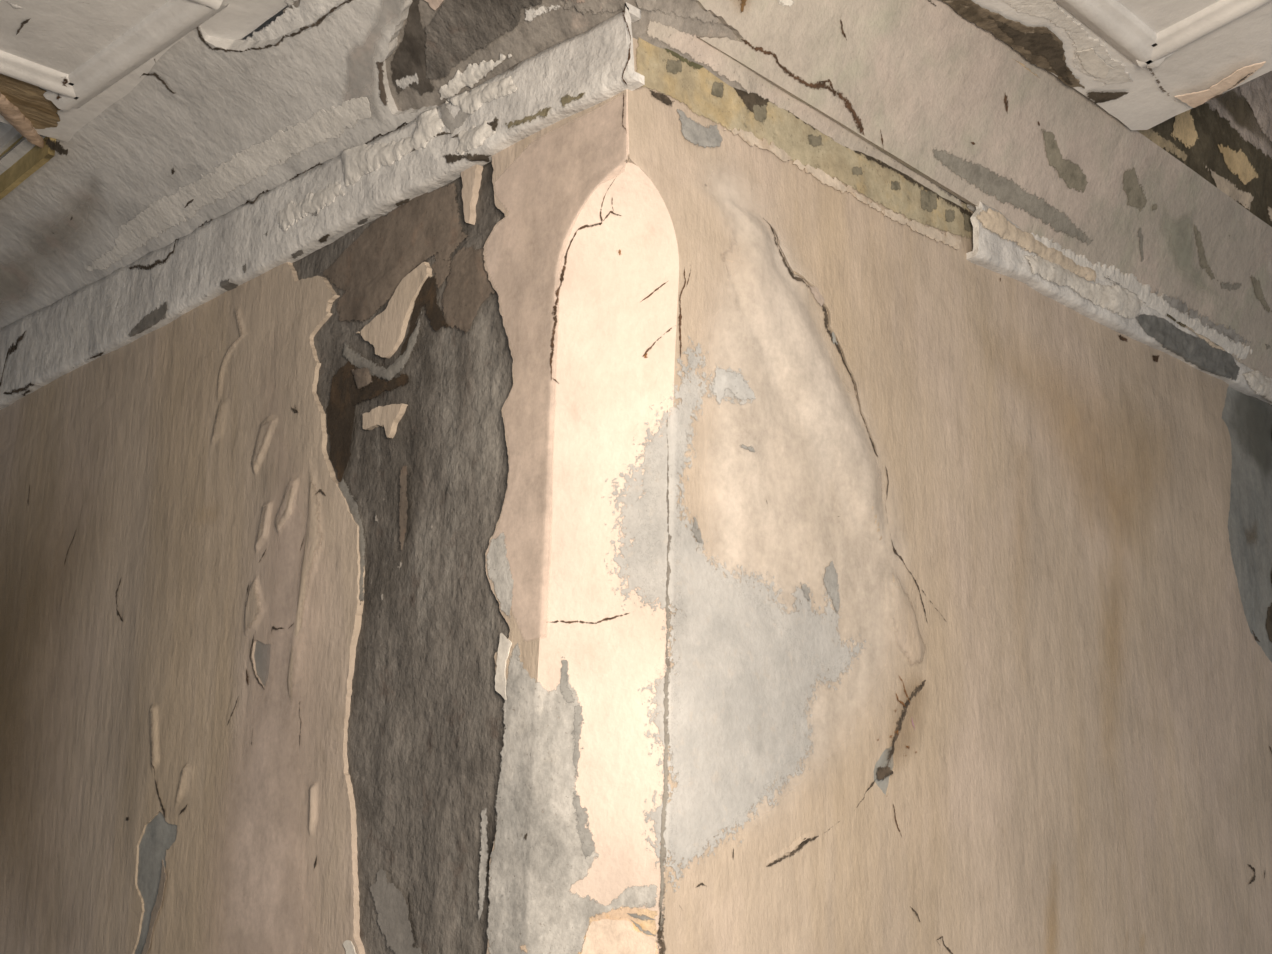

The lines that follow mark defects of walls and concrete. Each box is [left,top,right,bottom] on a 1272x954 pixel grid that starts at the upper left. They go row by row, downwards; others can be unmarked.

spalling [487,93,584,131]
crack [550,11,631,382]
peeling [647,20,963,208]
spalling [928,0,1133,104]
peeling [1043,129,1088,193]
peeling [1149,61,1266,108]
crack [0,331,34,396]
crack [763,217,946,624]
flaking render [932,149,1272,662]
spalling [291,153,872,954]
crack [657,406,704,954]
crack [764,676,926,867]